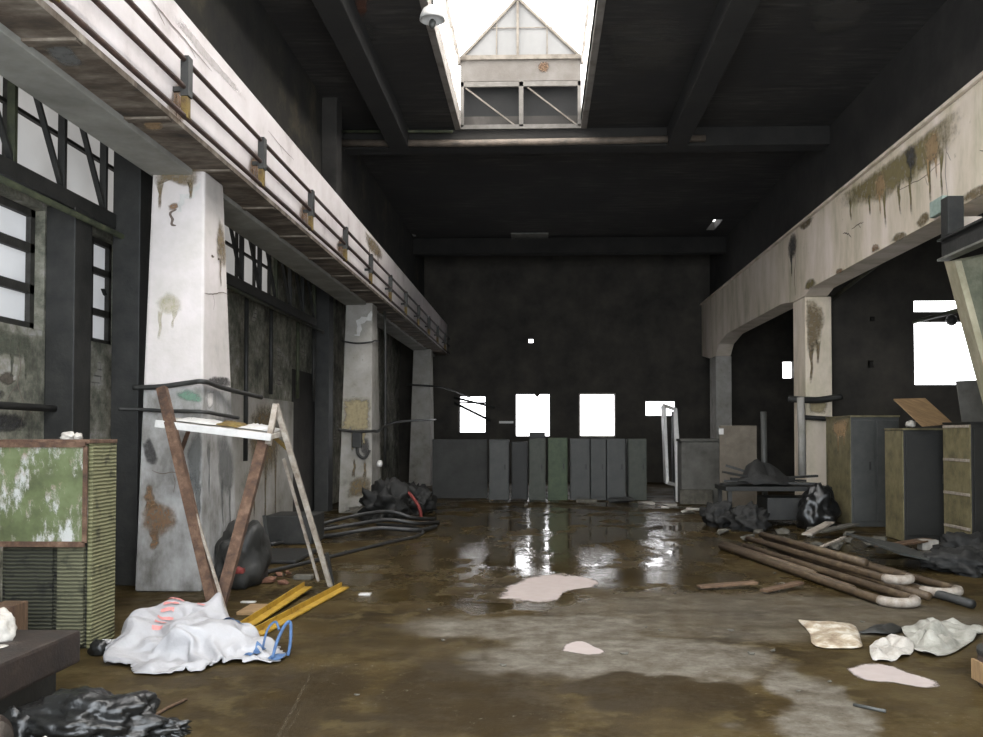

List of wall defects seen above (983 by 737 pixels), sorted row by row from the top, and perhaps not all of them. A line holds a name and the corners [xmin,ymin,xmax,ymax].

damp [789,218,811,274]
damp [0,332,30,377]
damp [806,301,823,380]
rust [144,486,175,549]